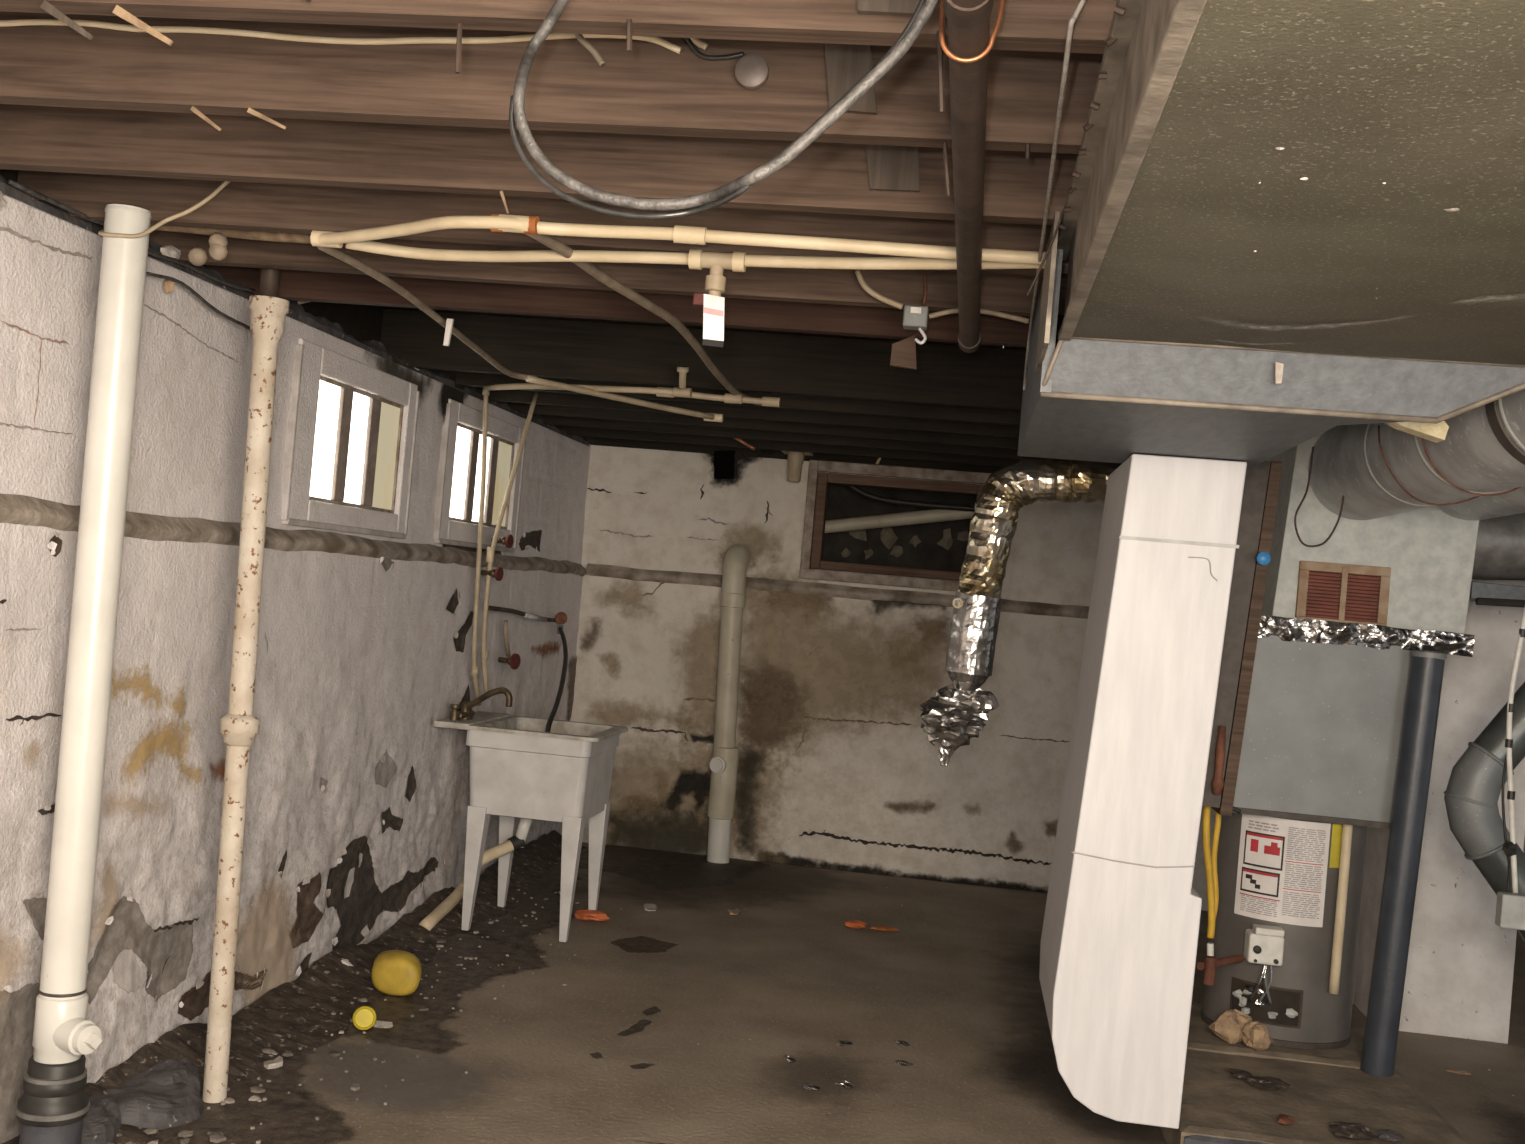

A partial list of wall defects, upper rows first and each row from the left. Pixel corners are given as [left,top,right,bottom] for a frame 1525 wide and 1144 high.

crack [0,592,41,631]
peeling [278,849,287,877]
spalling [289,751,445,977]
leakage [344,578,1048,1054]
crack [799,830,1051,865]
peeling [23,893,47,940]
spalling [86,895,211,1021]
spalling [234,968,268,991]
peeling [0,978,40,1144]
leakage [145,1048,352,1144]